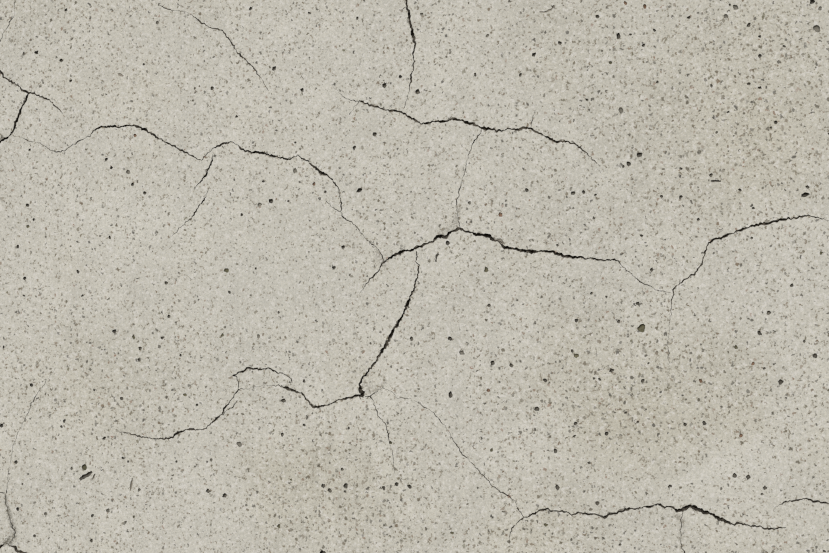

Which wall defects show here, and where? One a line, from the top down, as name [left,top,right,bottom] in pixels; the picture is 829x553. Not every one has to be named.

crack [0,70,63,143]
crack [160,5,268,90]
crack [333,0,597,176]
crack [25,124,829,553]
crack [0,377,50,553]